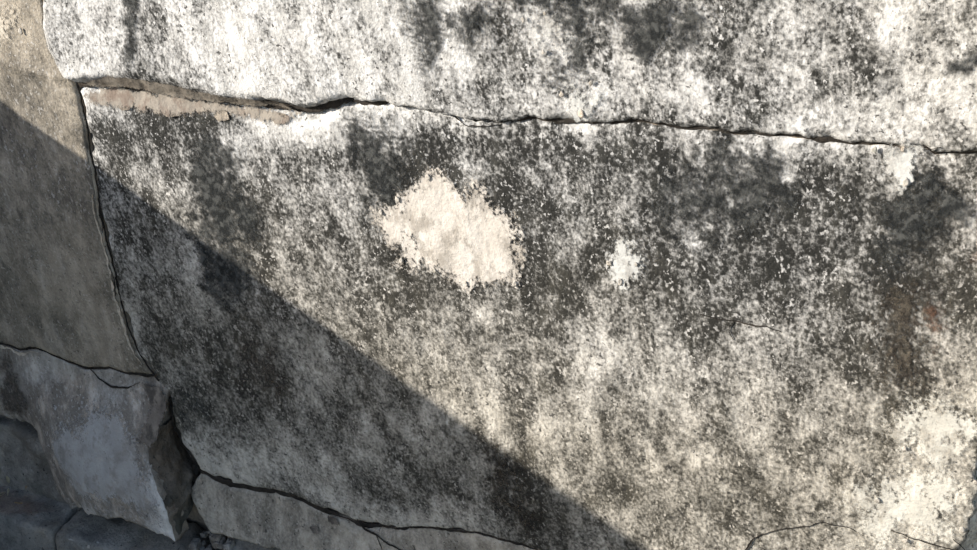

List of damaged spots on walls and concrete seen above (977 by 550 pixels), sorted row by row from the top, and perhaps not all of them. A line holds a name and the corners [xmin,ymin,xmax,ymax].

water stain [185,132,265,313]
water stain [345,111,409,214]
crack [452,115,977,154]
water stain [647,133,802,251]
water stain [867,168,975,276]
crack [0,82,538,550]
crack [700,314,782,339]
water stain [865,281,940,391]
water stain [485,445,543,534]
crack [745,522,863,550]
crack [891,530,965,550]